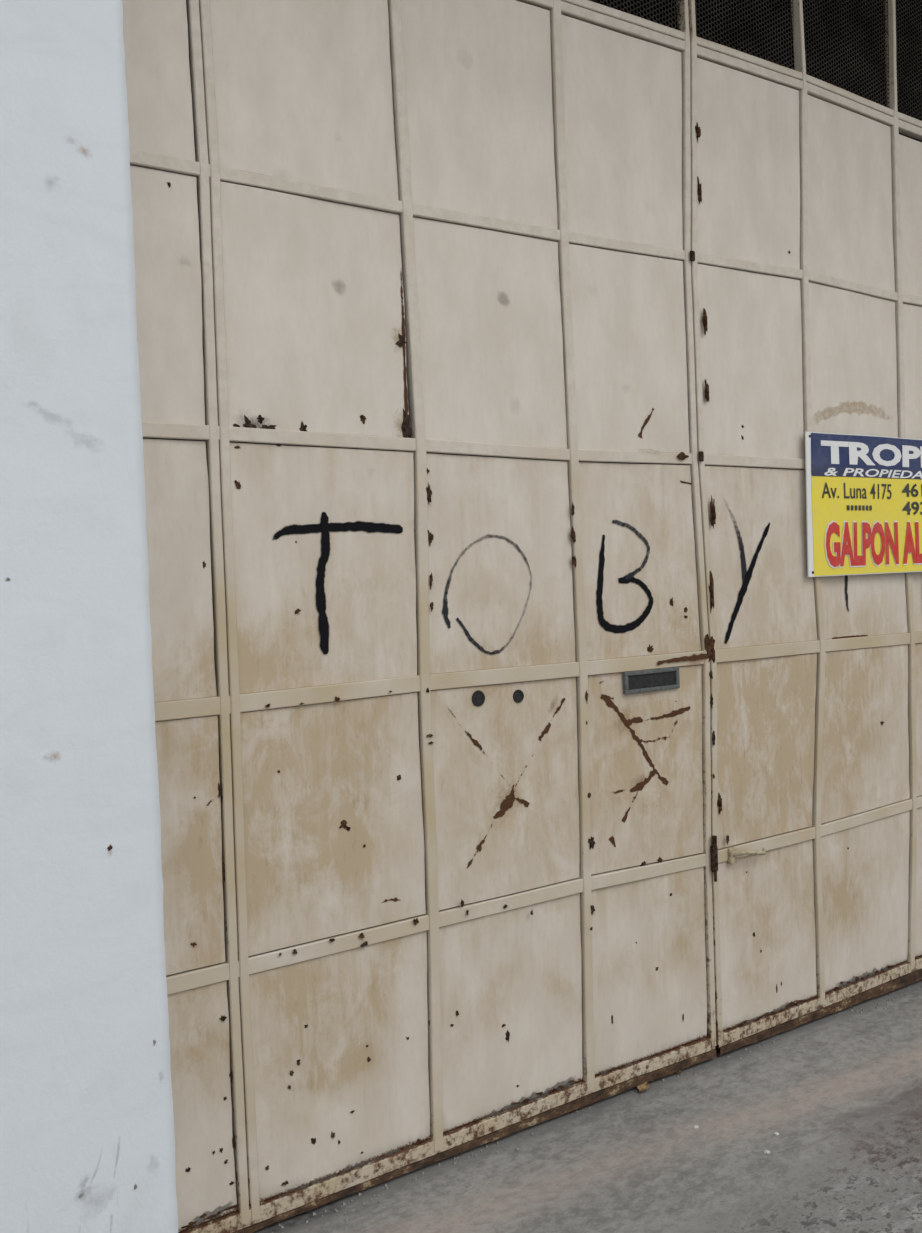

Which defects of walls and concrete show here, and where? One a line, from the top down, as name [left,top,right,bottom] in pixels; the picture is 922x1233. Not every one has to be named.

rust [395,268,412,438]
rust [233,415,276,429]
rust [647,634,715,707]
rust [585,683,690,823]
rust [467,698,565,868]
rust [588,836,616,849]
rust [833,965,893,990]
rust [730,1000,803,1030]
rust [471,1078,575,1124]
rust [281,1139,421,1194]
rust [181,1204,238,1229]